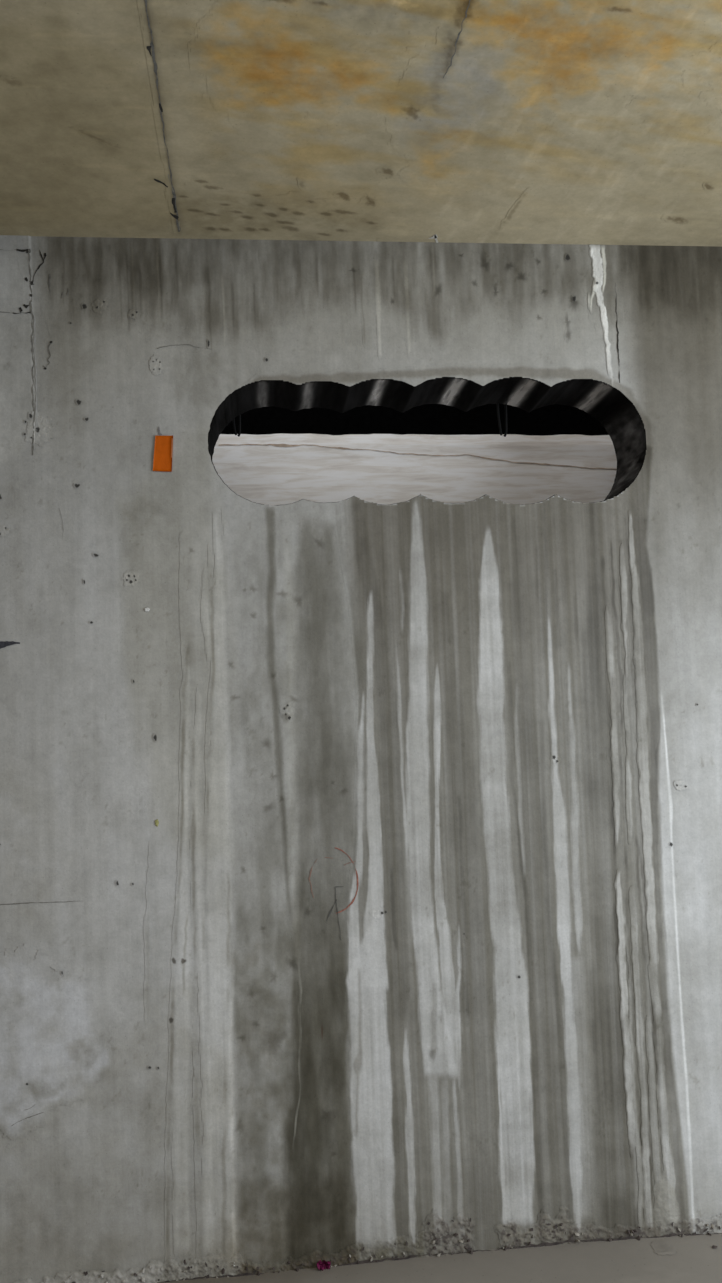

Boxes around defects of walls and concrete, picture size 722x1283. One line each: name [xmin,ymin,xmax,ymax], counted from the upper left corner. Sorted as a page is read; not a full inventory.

damp [17,178,604,364]
damp [164,245,722,1264]